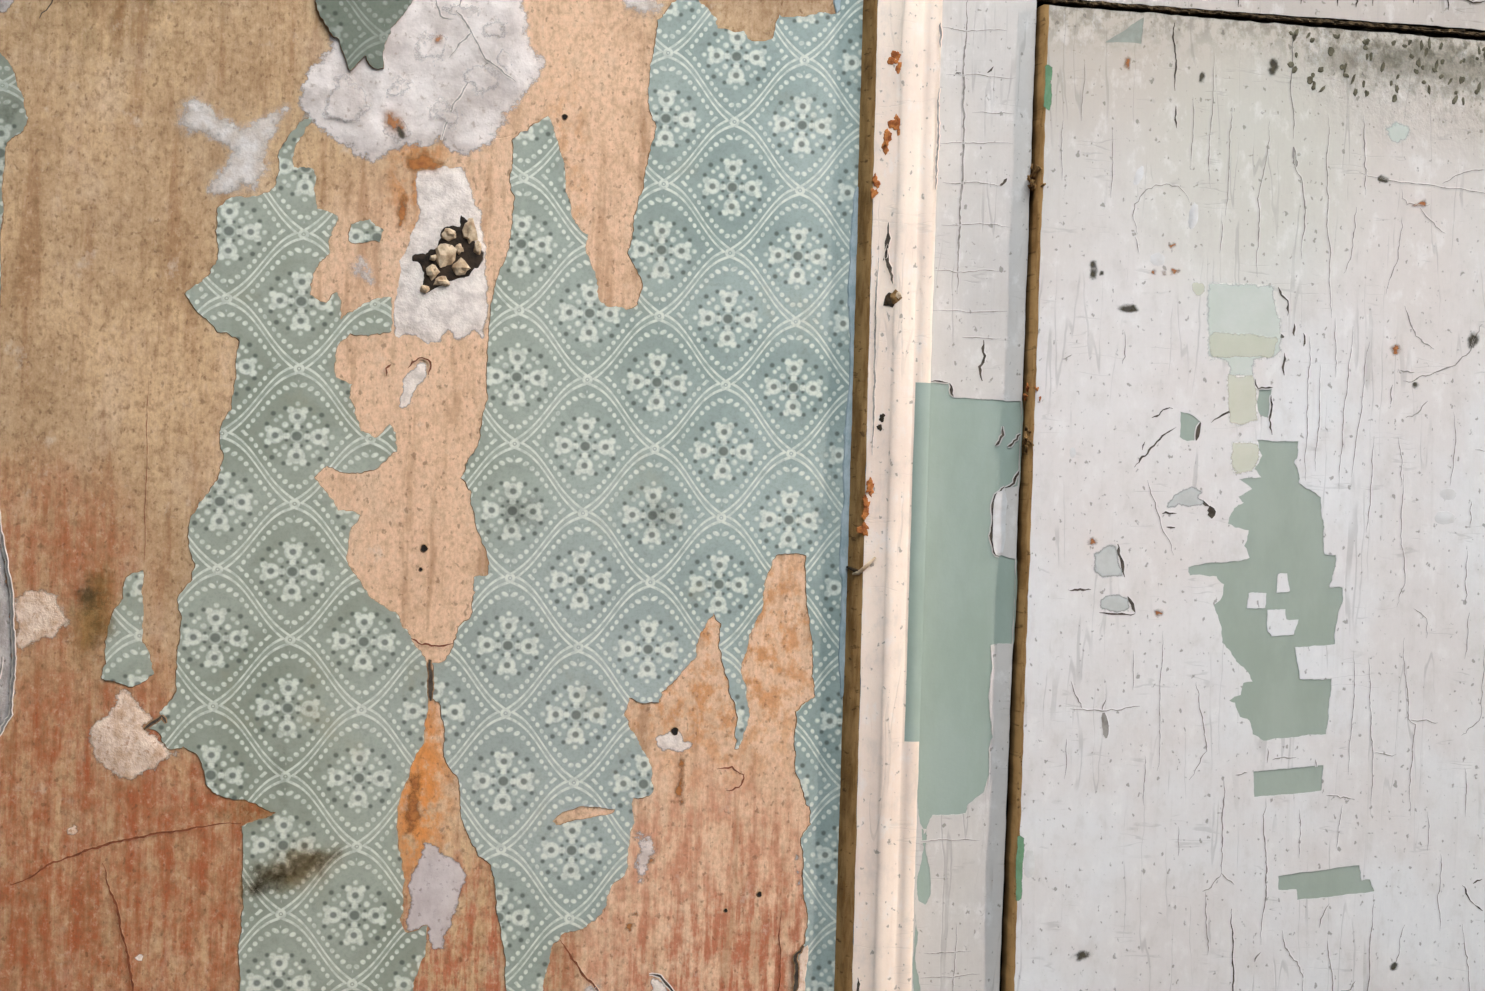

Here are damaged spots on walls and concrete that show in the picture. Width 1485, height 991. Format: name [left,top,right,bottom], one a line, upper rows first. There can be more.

rust [870,173,881,200]
rust [881,113,900,155]
rust [887,50,902,74]
crack [931,0,1015,397]
leakage [1269,29,1369,97]
leakage [1362,37,1485,105]
peeling [0,0,675,991]
peeling [543,554,815,991]
peeling [904,382,1024,991]
crack [988,426,1021,558]
peeling [1188,440,1343,741]
crack [1059,0,1485,991]